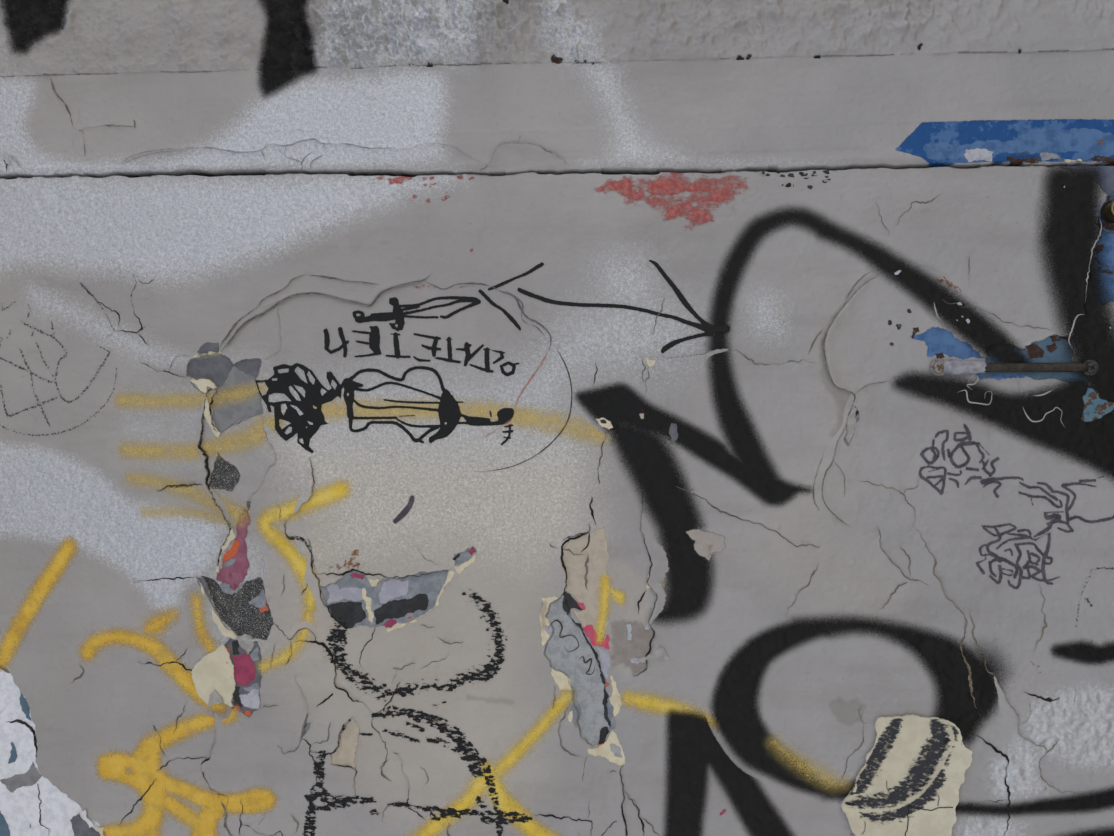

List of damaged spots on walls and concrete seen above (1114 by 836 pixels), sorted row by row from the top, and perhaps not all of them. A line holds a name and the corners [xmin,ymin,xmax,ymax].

peeling [895,119,1114,302]
peeling [186,342,263,438]
peeling [191,501,274,717]
crack [81,275,476,836]
crack [549,364,606,597]
peeling [563,528,610,638]
crack [637,493,669,676]
crack [642,300,815,398]
crack [861,480,1080,830]
peeling [911,302,1114,422]
peeling [0,665,105,836]
crack [534,691,660,836]